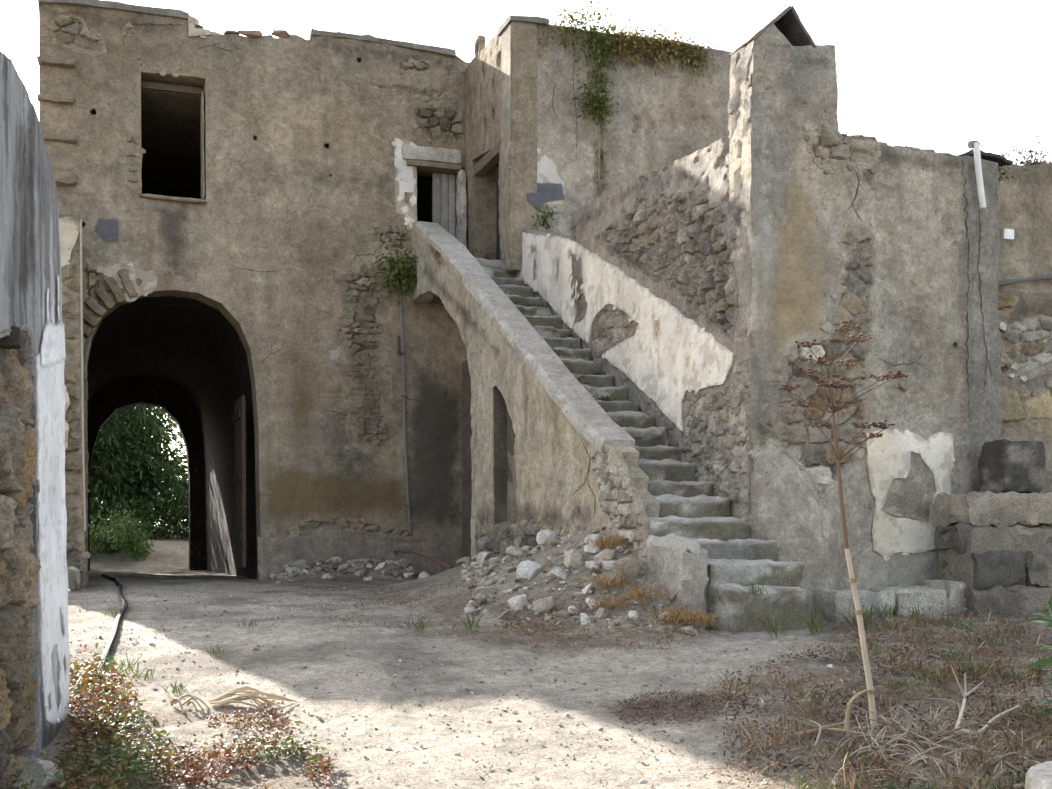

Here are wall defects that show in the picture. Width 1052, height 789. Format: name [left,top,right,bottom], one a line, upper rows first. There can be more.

peeling [59,215,80,268]
spalling [82,257,158,528]
spalling [332,261,397,456]
spalling [312,57,464,251]
peeling [516,186,957,561]
spalling [804,118,885,192]
crack [961,161,992,431]
spalling [998,289,1052,442]
peeling [34,352,70,724]